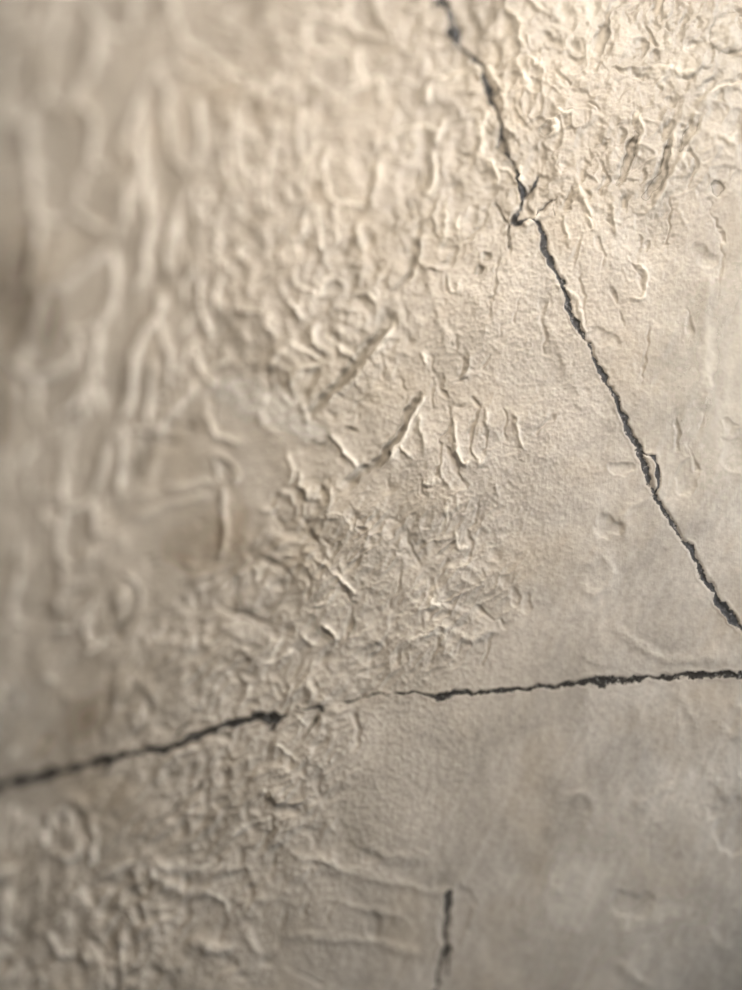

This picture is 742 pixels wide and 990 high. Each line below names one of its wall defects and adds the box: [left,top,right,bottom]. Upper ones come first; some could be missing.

spalling [472,253,493,278]
spalling [308,255,422,416]
crack [433,0,742,631]
spalling [211,453,240,484]
spalling [343,391,429,489]
spalling [105,574,146,640]
peeling [235,554,293,612]
peeling [311,585,356,655]
crack [0,670,742,792]